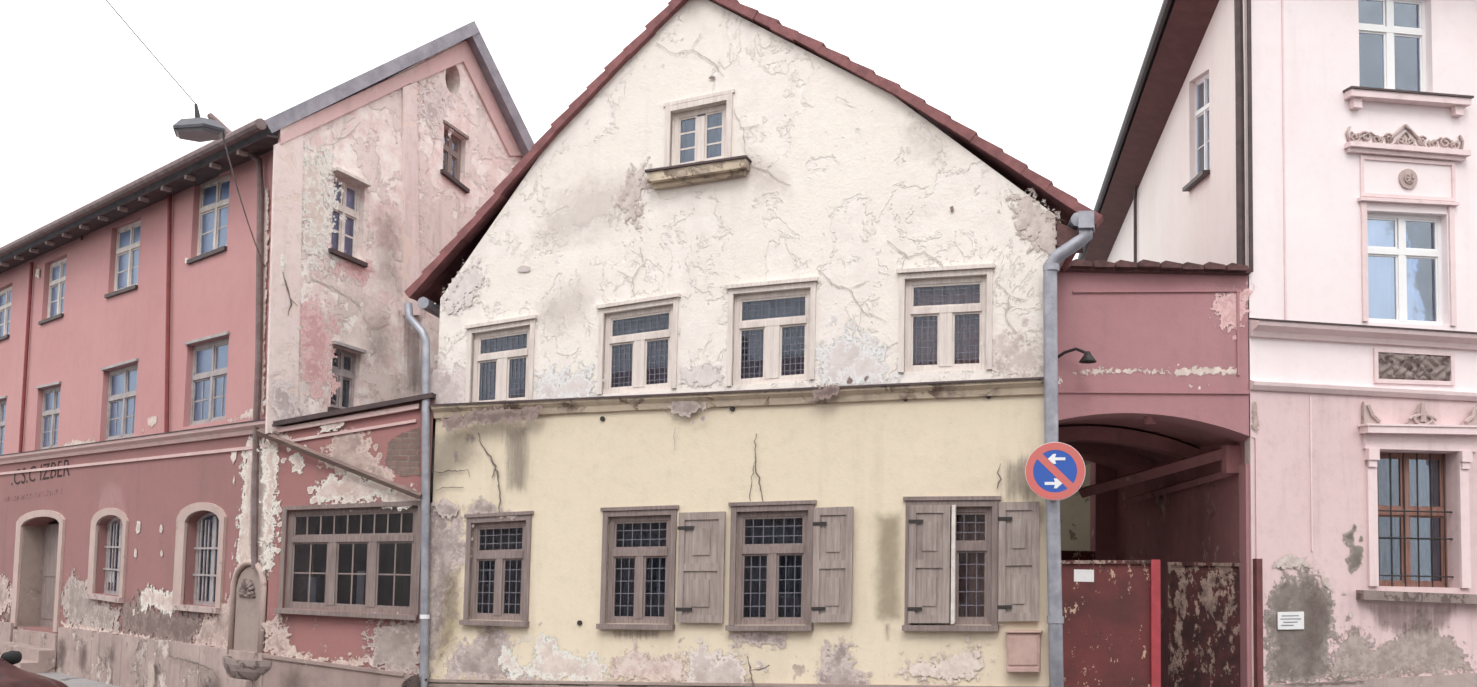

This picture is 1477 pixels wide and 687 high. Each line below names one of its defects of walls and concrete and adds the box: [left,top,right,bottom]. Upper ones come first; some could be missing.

crack [656,34,724,77]
crack [887,240,943,269]
peeling [998,188,1065,263]
crack [817,269,886,330]
crack [995,280,1027,334]
spalling [60,136,516,648]
crack [434,433,501,513]
crack [749,434,763,501]
spalling [1343,524,1364,574]
flaking render [259,612,786,687]
flaking render [813,636,872,685]
spalling [1263,554,1477,685]